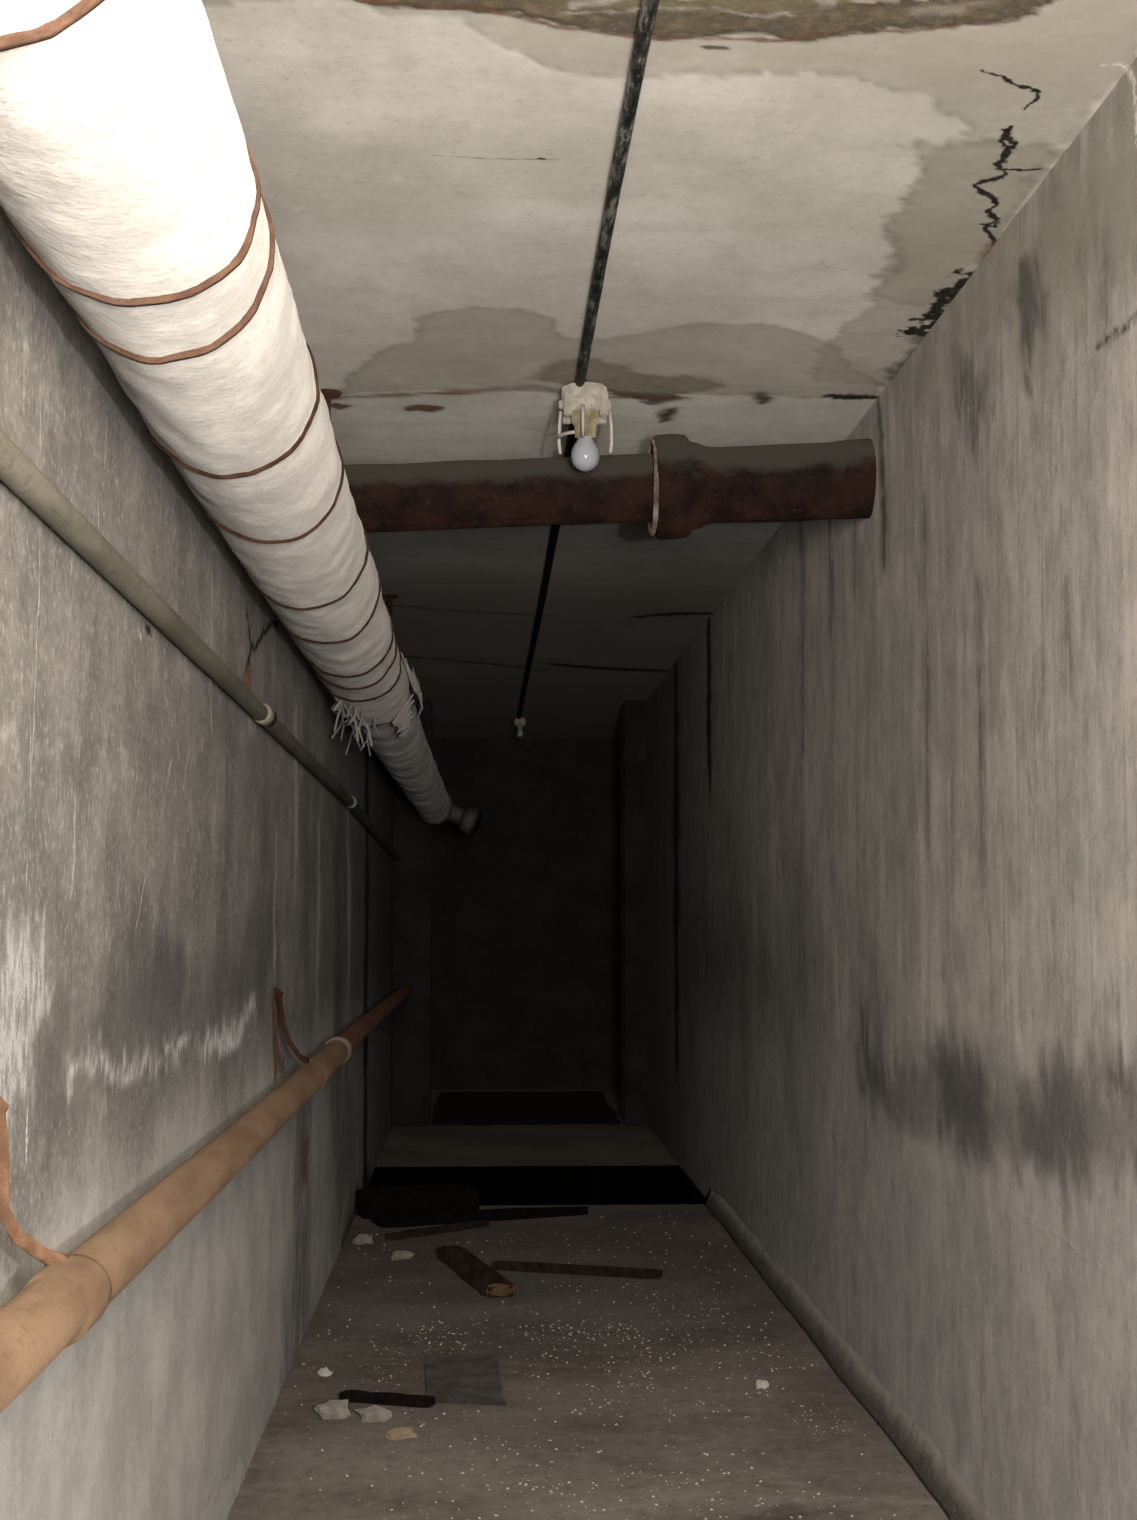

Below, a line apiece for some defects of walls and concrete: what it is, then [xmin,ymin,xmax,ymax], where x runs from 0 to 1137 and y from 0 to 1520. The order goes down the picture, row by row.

damp [358,0,1053,49]
crack [973,70,1041,245]
damp [972,63,1137,324]
damp [515,358,722,422]
damp [756,392,771,404]
damp [824,394,883,437]
damp [0,913,50,1123]
damp [66,993,256,1098]